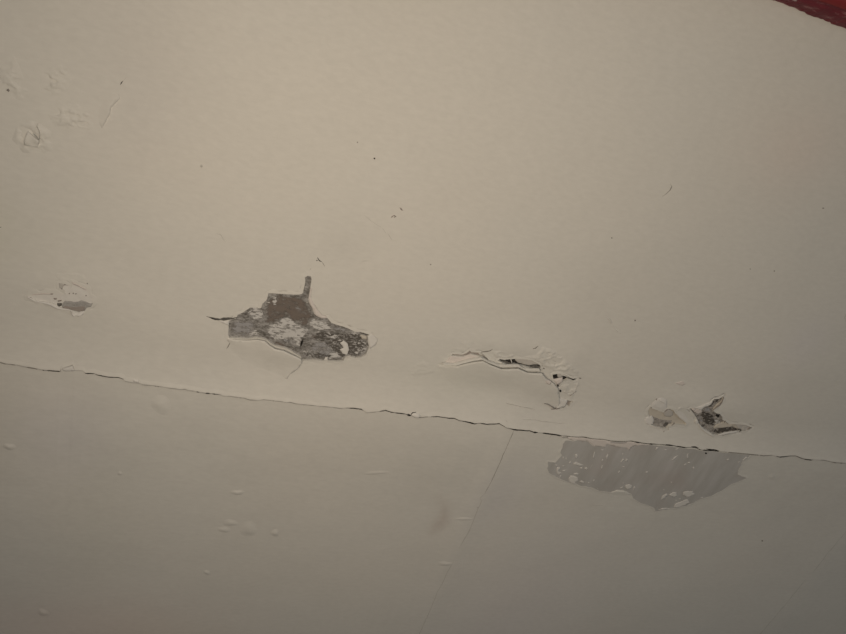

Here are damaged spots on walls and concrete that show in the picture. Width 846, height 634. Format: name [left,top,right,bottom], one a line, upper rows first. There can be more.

spalling [24,273,98,317]
spalling [206,271,378,379]
peeling [407,340,581,411]
crack [0,358,846,545]
peeling [545,436,752,512]
spalling [645,394,753,438]